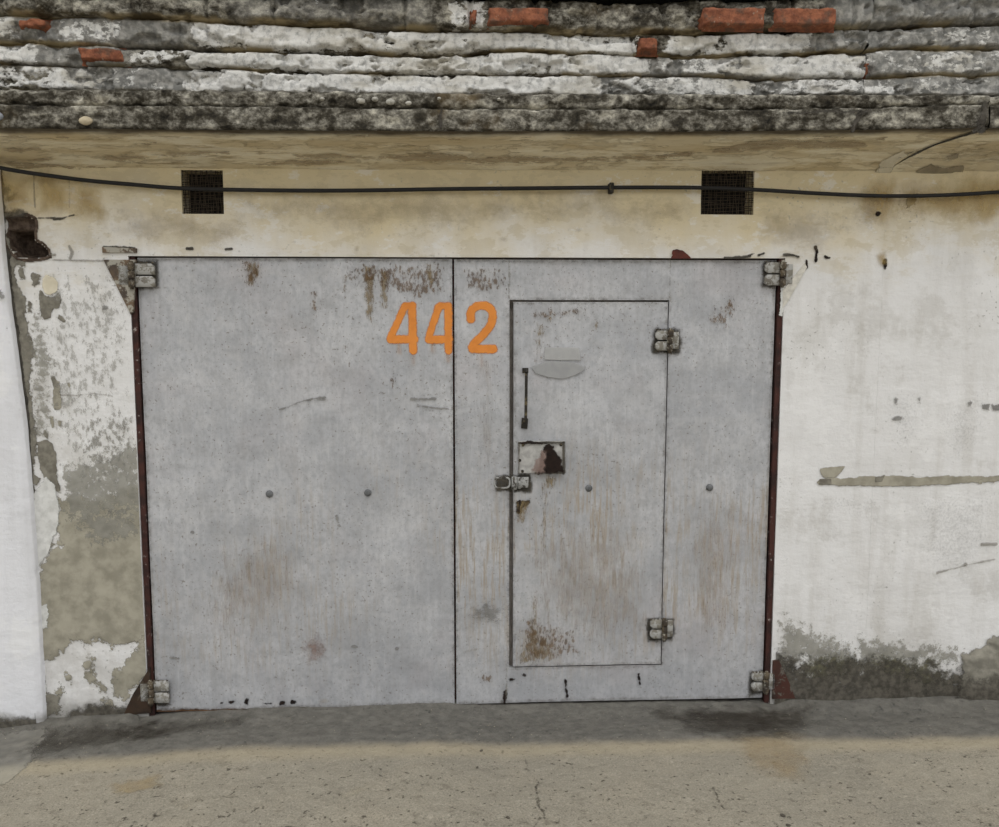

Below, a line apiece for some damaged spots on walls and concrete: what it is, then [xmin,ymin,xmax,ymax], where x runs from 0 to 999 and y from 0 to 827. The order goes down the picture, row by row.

rust [344,264,444,322]
flaking render [5,213,146,717]
rust [520,440,564,496]
spalling [817,466,999,487]
rust [516,500,530,523]
rust [521,596,578,662]
water stain [774,656,964,704]